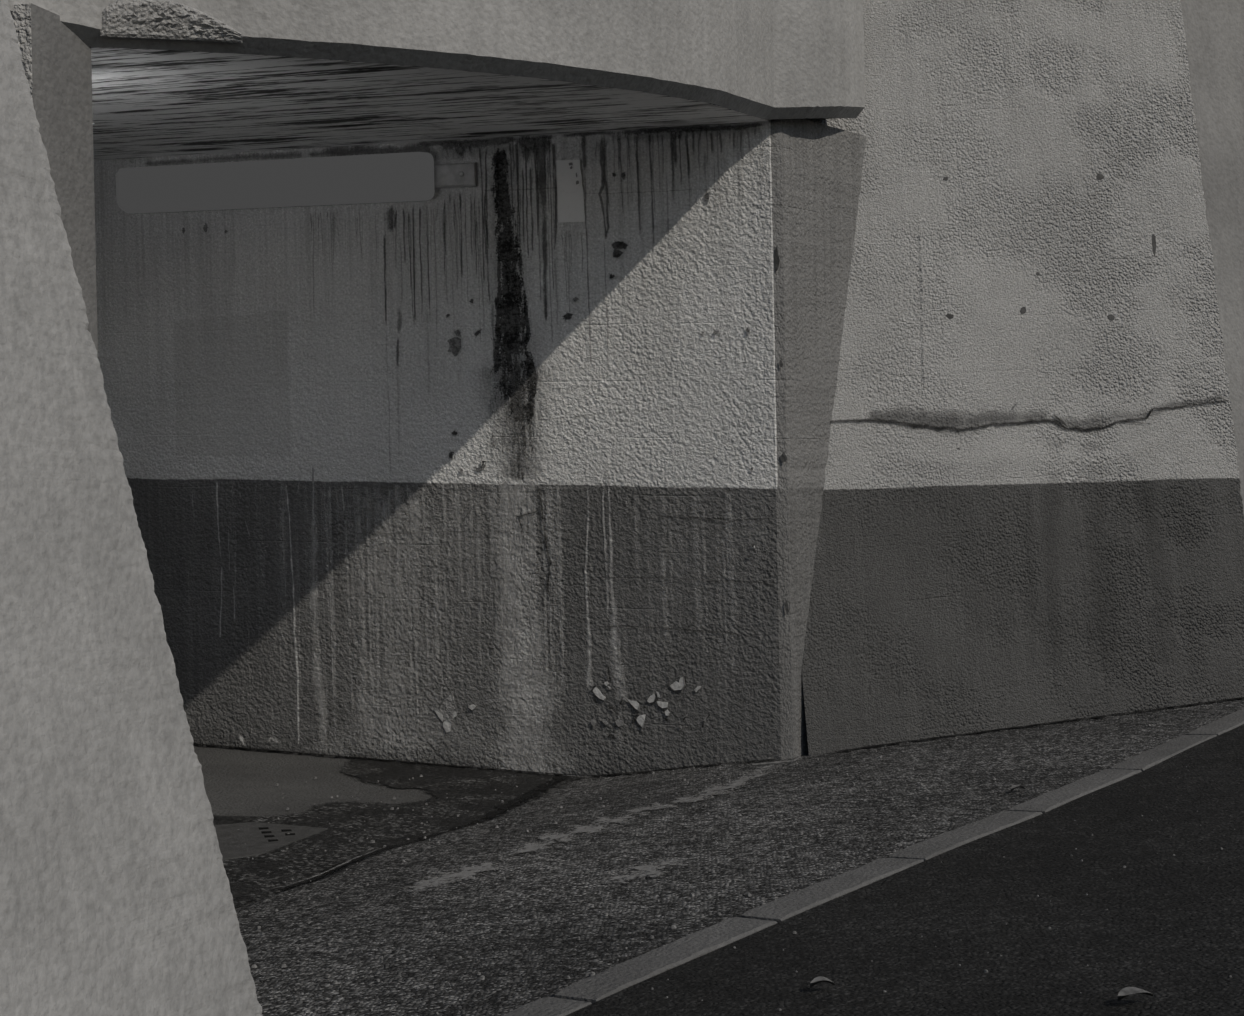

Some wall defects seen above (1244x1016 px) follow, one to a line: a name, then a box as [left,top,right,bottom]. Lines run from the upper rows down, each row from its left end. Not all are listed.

crack [830,400,1229,431]
water stain [147,123,762,907]
peeling [434,692,476,733]
peeling [591,667,702,739]